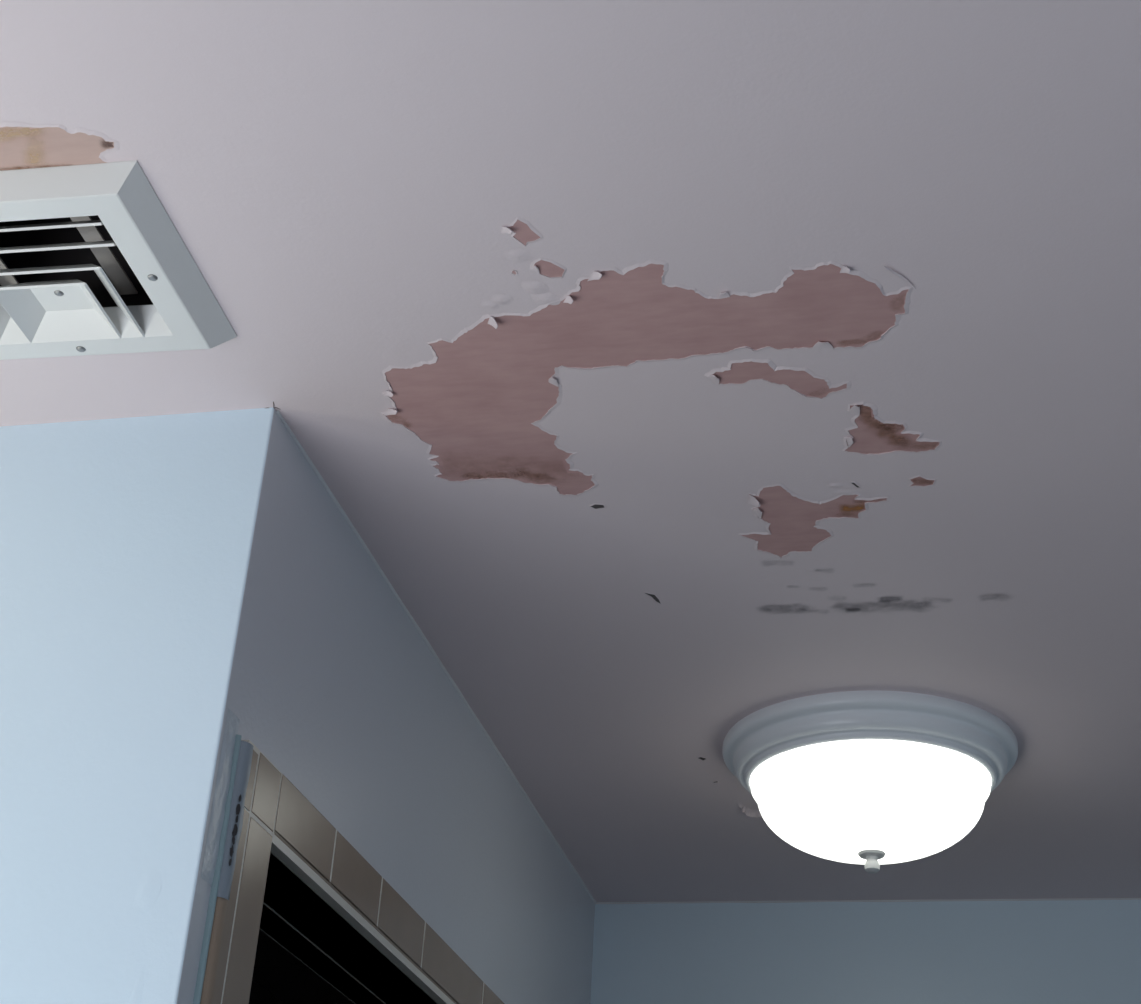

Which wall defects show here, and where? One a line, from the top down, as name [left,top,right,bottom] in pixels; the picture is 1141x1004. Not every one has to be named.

peeling [0,122,119,170]
peeling [501,217,544,247]
peeling [380,258,942,509]
peeling [738,481,891,559]